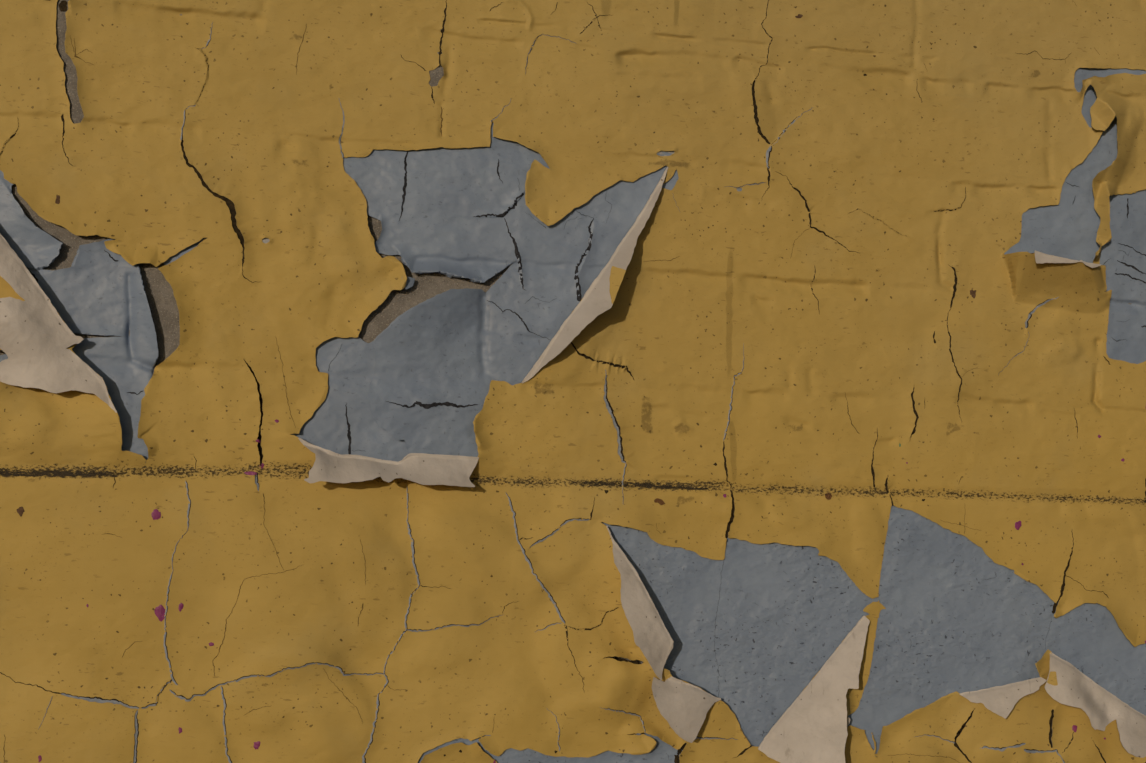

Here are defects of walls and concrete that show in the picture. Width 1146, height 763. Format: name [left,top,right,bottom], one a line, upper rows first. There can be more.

crack [49,0,93,65]
peeling [0,170,207,463]
crack [180,23,256,283]
crack [0,339,518,763]
crack [401,0,447,137]
peeling [290,122,678,487]
crack [506,493,646,735]
crack [571,342,634,501]
peeling [418,505,1146,763]
crack [726,0,858,310]
crack [933,266,1058,421]
peeling [1004,68,1146,364]